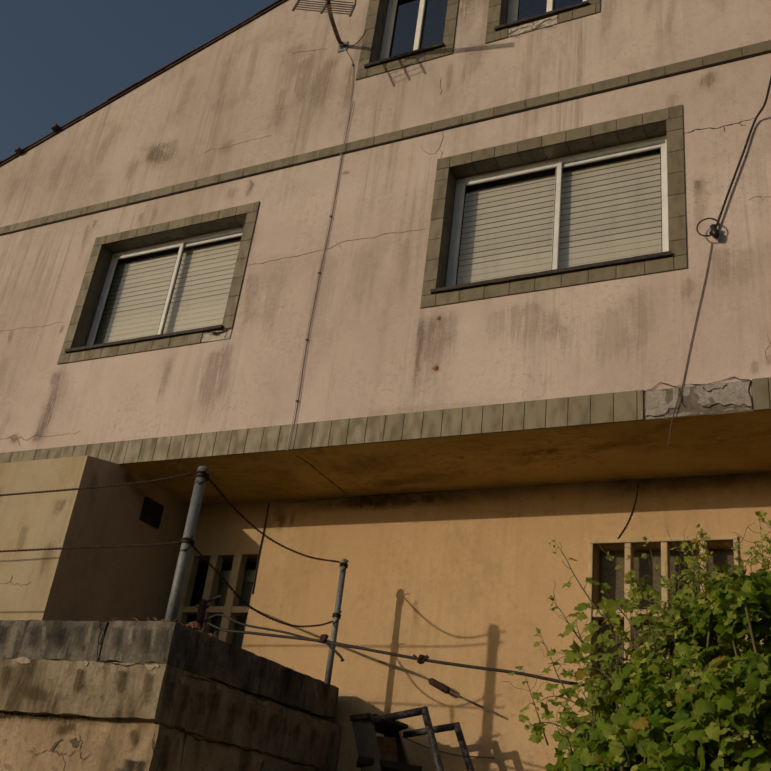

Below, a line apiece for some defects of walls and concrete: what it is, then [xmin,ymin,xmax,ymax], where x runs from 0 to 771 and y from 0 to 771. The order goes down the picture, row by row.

crack [684,118,755,134]
peeling [643,376,753,420]